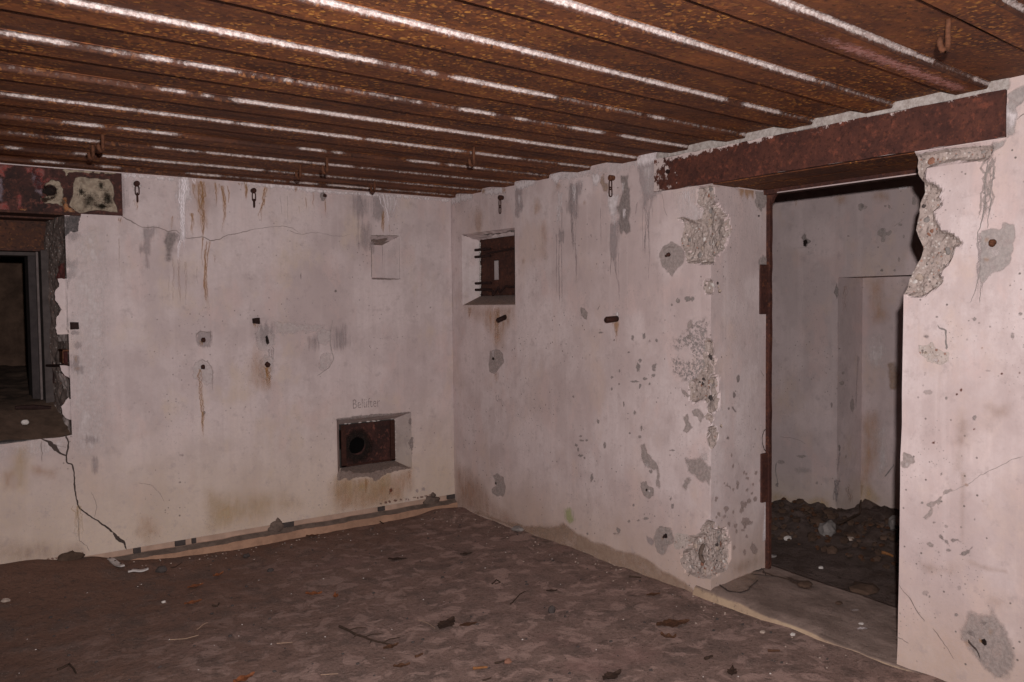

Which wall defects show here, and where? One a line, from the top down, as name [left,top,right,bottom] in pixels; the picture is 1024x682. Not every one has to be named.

peeling [65,177,117,240]
corrosion [191,182,229,294]
crack [122,195,398,280]
leakage [550,152,657,291]
spalling [659,184,732,276]
spalling [878,146,994,297]
spalling [673,320,740,489]
crack [41,433,127,550]
peeling [629,426,660,498]
spalling [680,520,730,579]